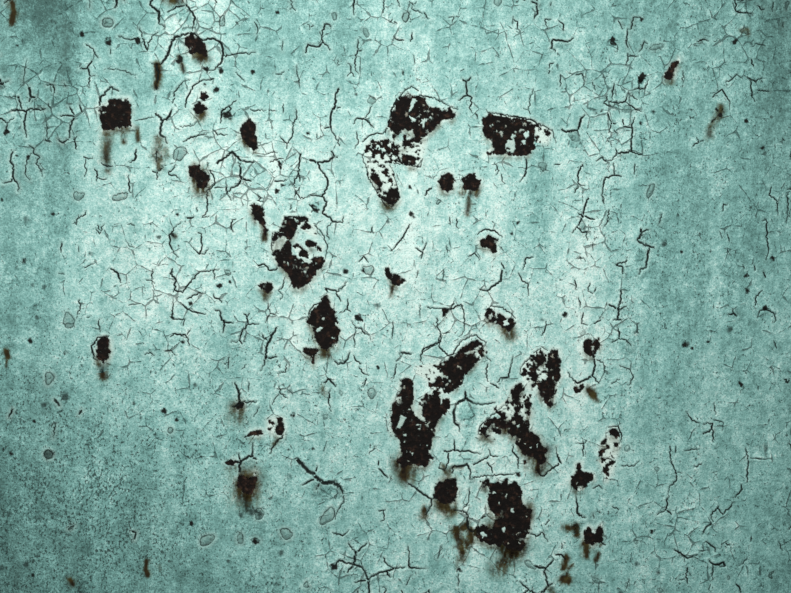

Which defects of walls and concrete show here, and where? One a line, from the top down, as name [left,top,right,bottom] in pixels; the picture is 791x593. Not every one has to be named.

crack [513,0,649,260]
crack [0,0,585,415]
crack [574,214,662,345]
crack [743,186,791,348]
corrosion [225,459,259,504]
crack [237,435,284,472]
crack [296,458,442,593]
crack [391,302,562,532]
crack [520,520,566,593]
crack [568,356,620,384]
crack [657,402,716,515]
crack [674,448,770,589]